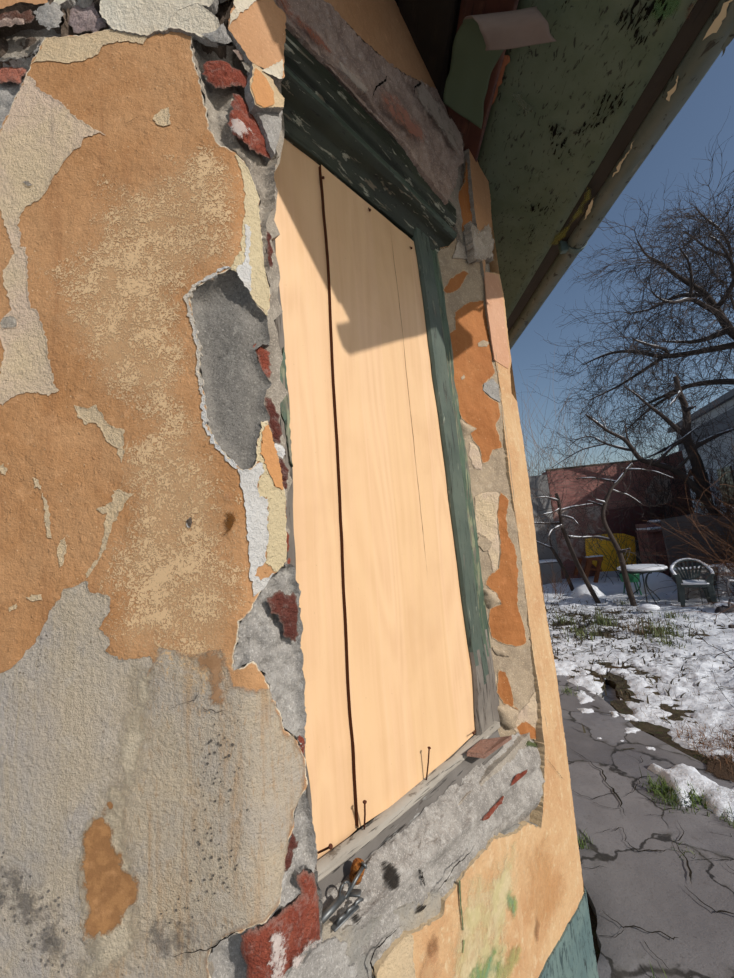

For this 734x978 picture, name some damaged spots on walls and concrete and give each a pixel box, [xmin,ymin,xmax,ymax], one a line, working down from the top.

peeling [450,300,503,470]
peeling [0,0,464,978]
peeling [475,491,526,656]
peeling [497,670,538,740]
flaking render [480,796,504,821]
crack [570,748,734,914]
crack [592,910,678,969]